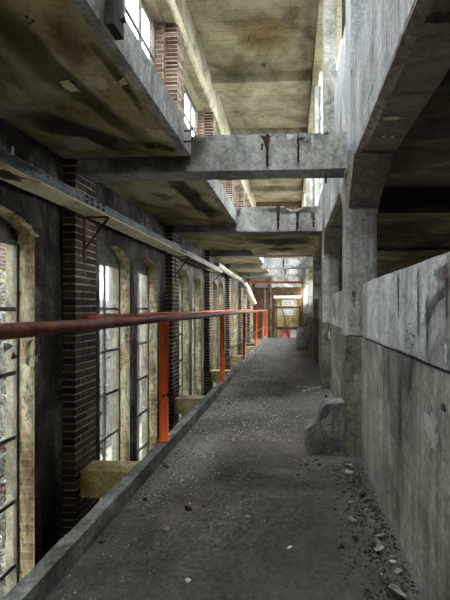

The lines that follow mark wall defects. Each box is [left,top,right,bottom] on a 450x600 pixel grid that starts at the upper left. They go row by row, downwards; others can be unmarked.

peeling [60,74,112,93]
leakage [32,115,201,168]
leakage [417,254,449,355]